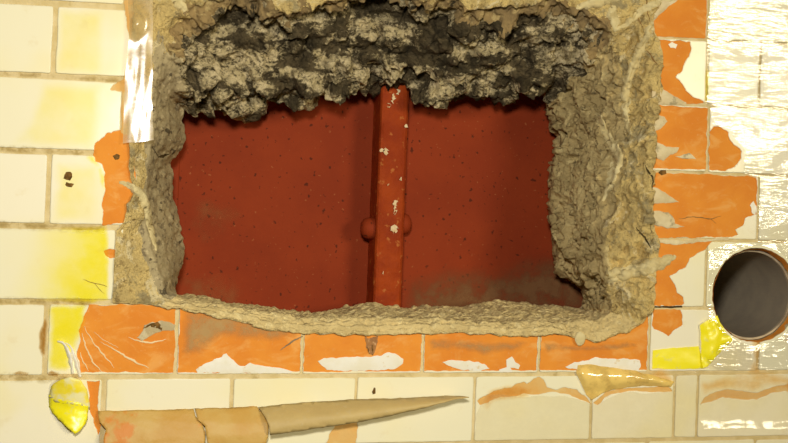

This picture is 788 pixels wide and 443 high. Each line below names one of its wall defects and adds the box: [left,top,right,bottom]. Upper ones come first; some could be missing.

spalling [77,0,757,405]
spalling [87,381,101,435]